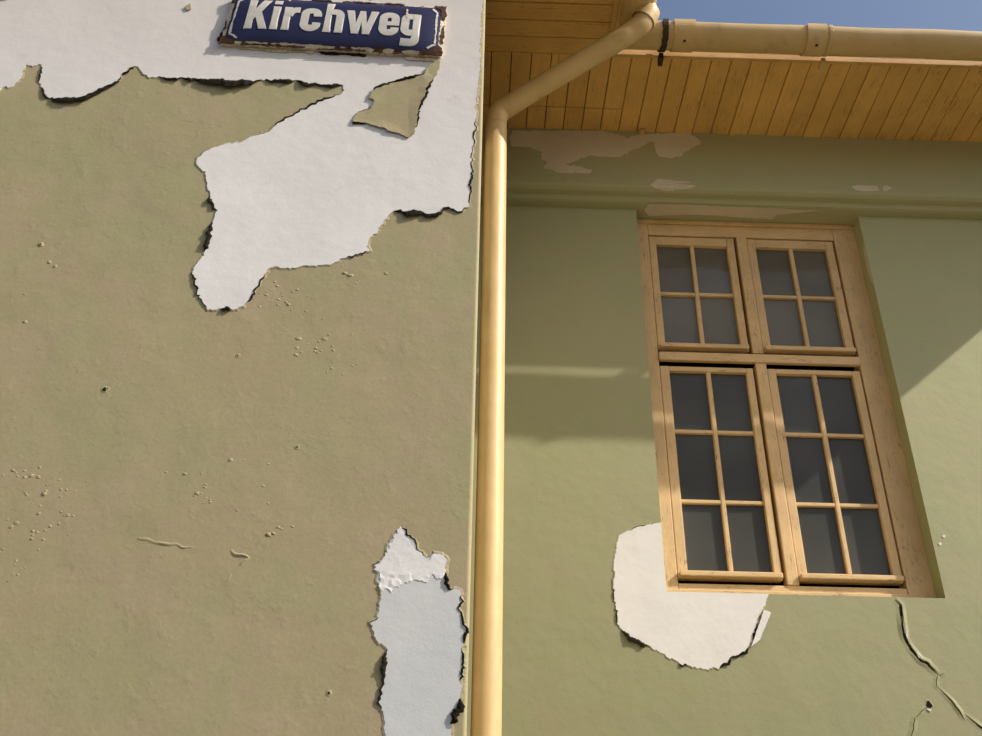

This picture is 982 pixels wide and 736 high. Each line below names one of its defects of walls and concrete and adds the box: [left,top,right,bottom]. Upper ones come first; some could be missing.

peeling [0,0,484,312]
peeling [509,129,703,175]
peeling [367,524,469,736]
peeling [611,522,771,672]
crack [893,596,982,736]